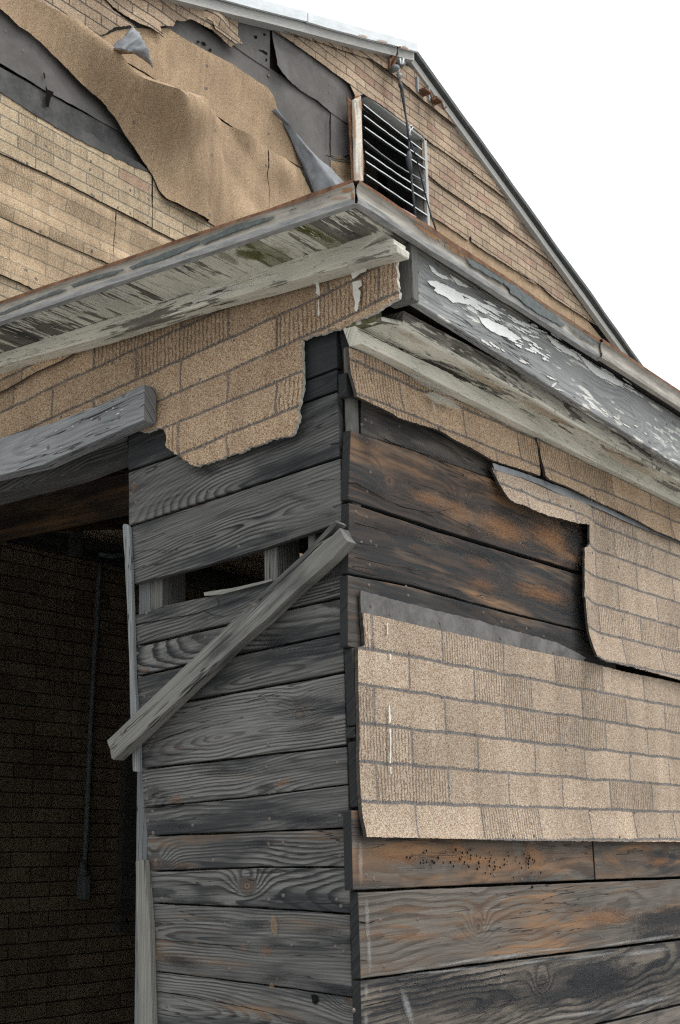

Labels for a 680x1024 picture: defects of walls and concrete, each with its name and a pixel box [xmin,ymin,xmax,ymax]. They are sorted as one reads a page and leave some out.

peeling [0,216,279,345]
peeling [400,348,502,399]
peeling [427,256,643,398]